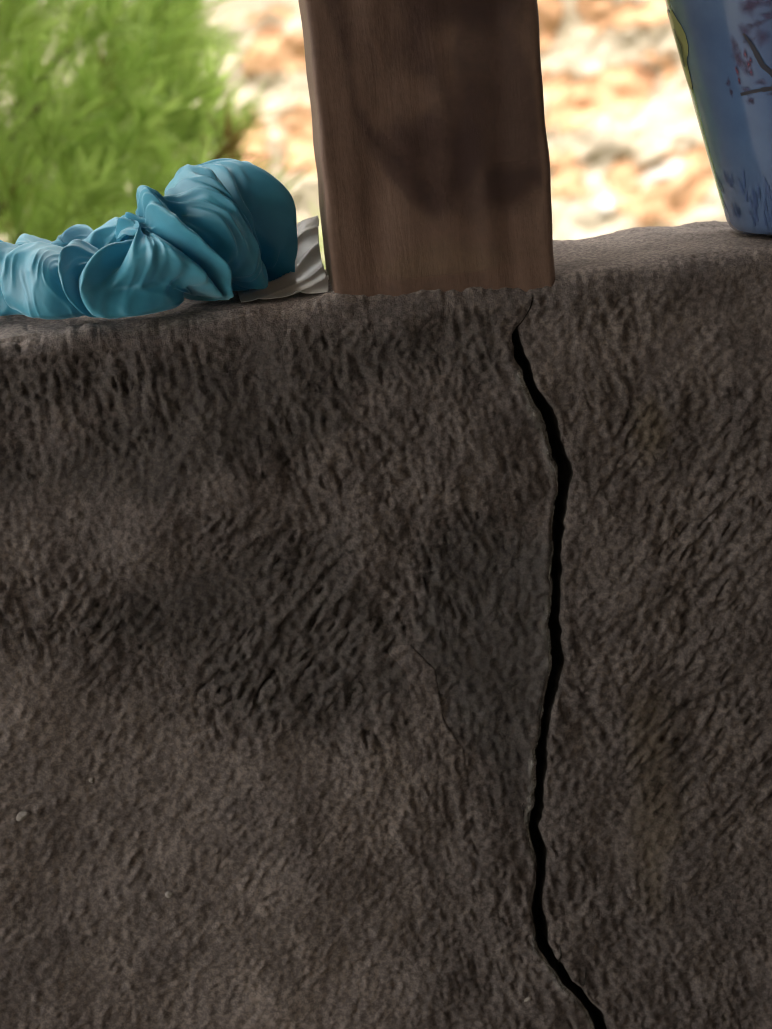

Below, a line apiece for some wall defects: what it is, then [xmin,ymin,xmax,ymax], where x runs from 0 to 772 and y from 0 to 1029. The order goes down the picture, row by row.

crack [512,300,607,1029]